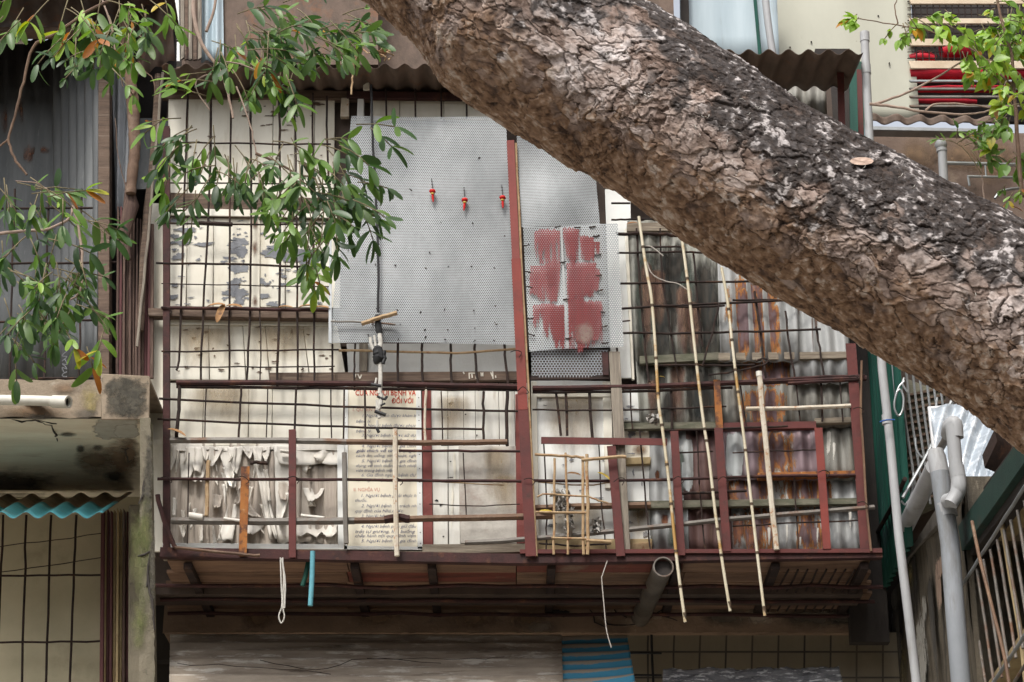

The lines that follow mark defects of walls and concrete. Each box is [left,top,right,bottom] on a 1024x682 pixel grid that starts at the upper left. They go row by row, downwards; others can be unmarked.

peeling [171,217,214,261]
peeling [207,220,321,306]
crack [0,417,58,442]
damp [104,378,146,417]
rust [725,275,833,549]
damp [0,473,45,497]
damp [61,433,155,618]
peeling [171,443,337,544]